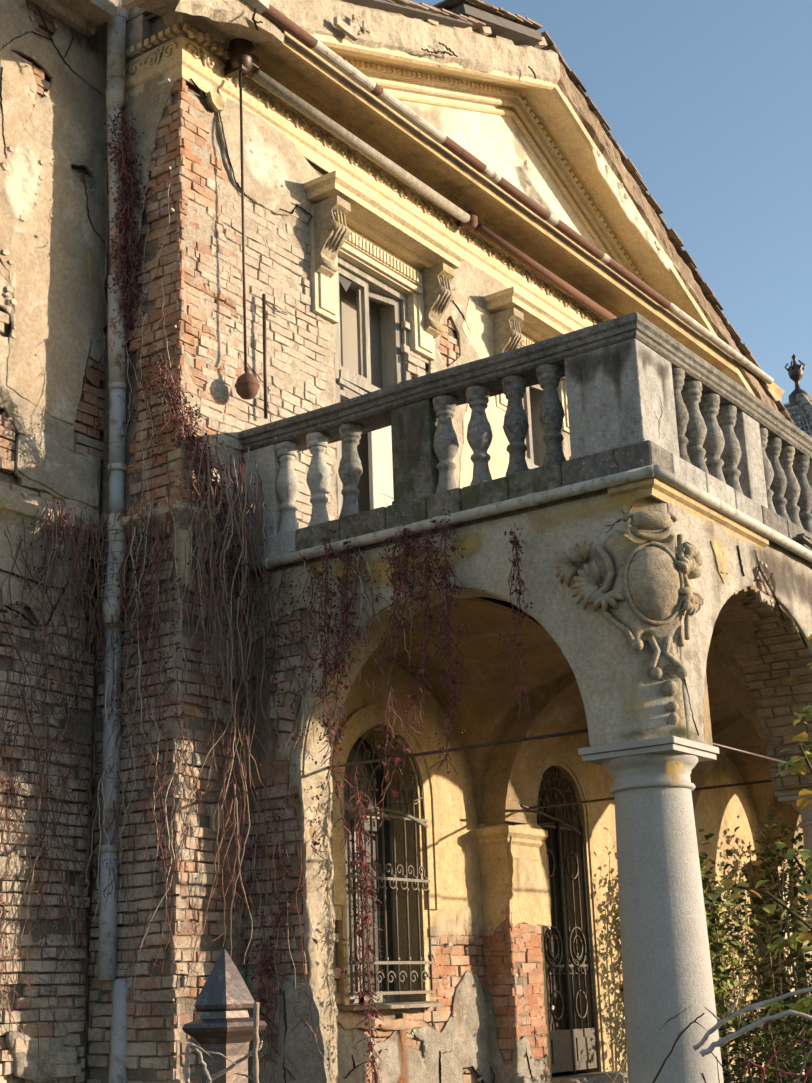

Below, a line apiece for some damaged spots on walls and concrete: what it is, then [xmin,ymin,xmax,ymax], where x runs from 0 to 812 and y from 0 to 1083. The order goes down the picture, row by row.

spalling [11,51,51,99]
crack [0,4,103,159]
crack [421,42,458,57]
peeling [244,138,288,191]
crack [82,170,105,242]
crack [0,258,15,313]
spalling [0,249,18,338]
spalling [125,78,246,516]
spalling [0,415,66,507]
spalling [753,560,775,609]
crack [344,1055,371,1079]
crack [439,1050,495,1083]